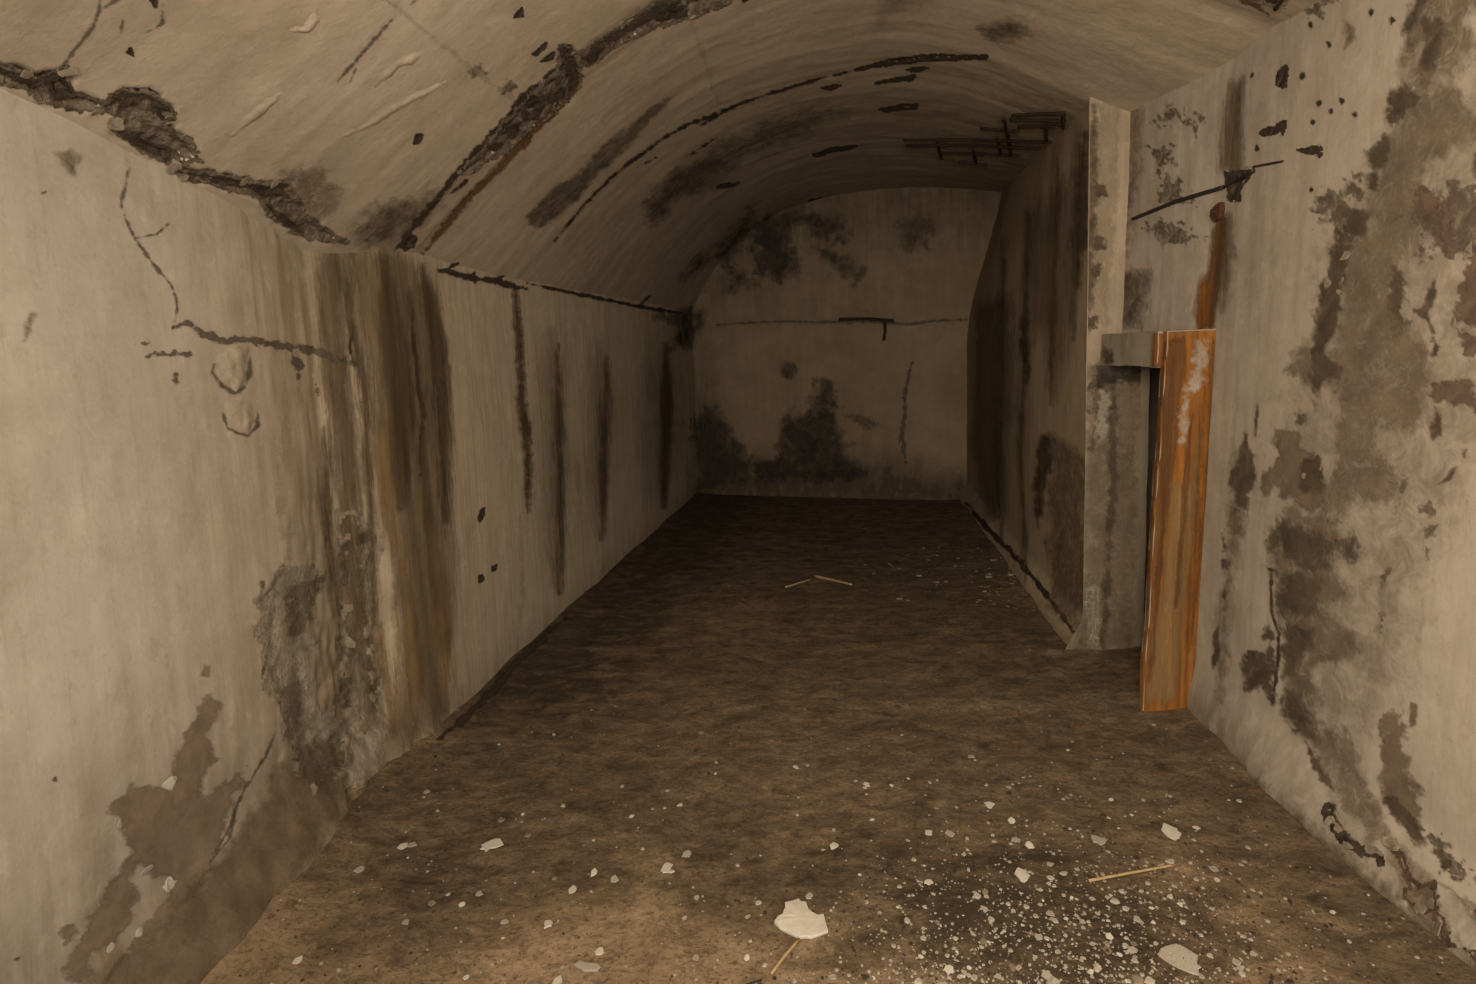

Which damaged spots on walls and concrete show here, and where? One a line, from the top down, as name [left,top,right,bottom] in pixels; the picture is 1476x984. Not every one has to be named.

spalling [0,62,350,245]
spalling [457,0,749,176]
spalling [854,53,989,85]
crack [120,171,357,395]
leakage [320,201,453,741]
crack [411,311,426,476]
leakage [512,291,532,505]
leakage [694,380,861,488]
corrosion [1140,216,1232,712]
leakage [1267,0,1476,841]
peeling [59,695,245,982]
peeling [1321,703,1476,971]